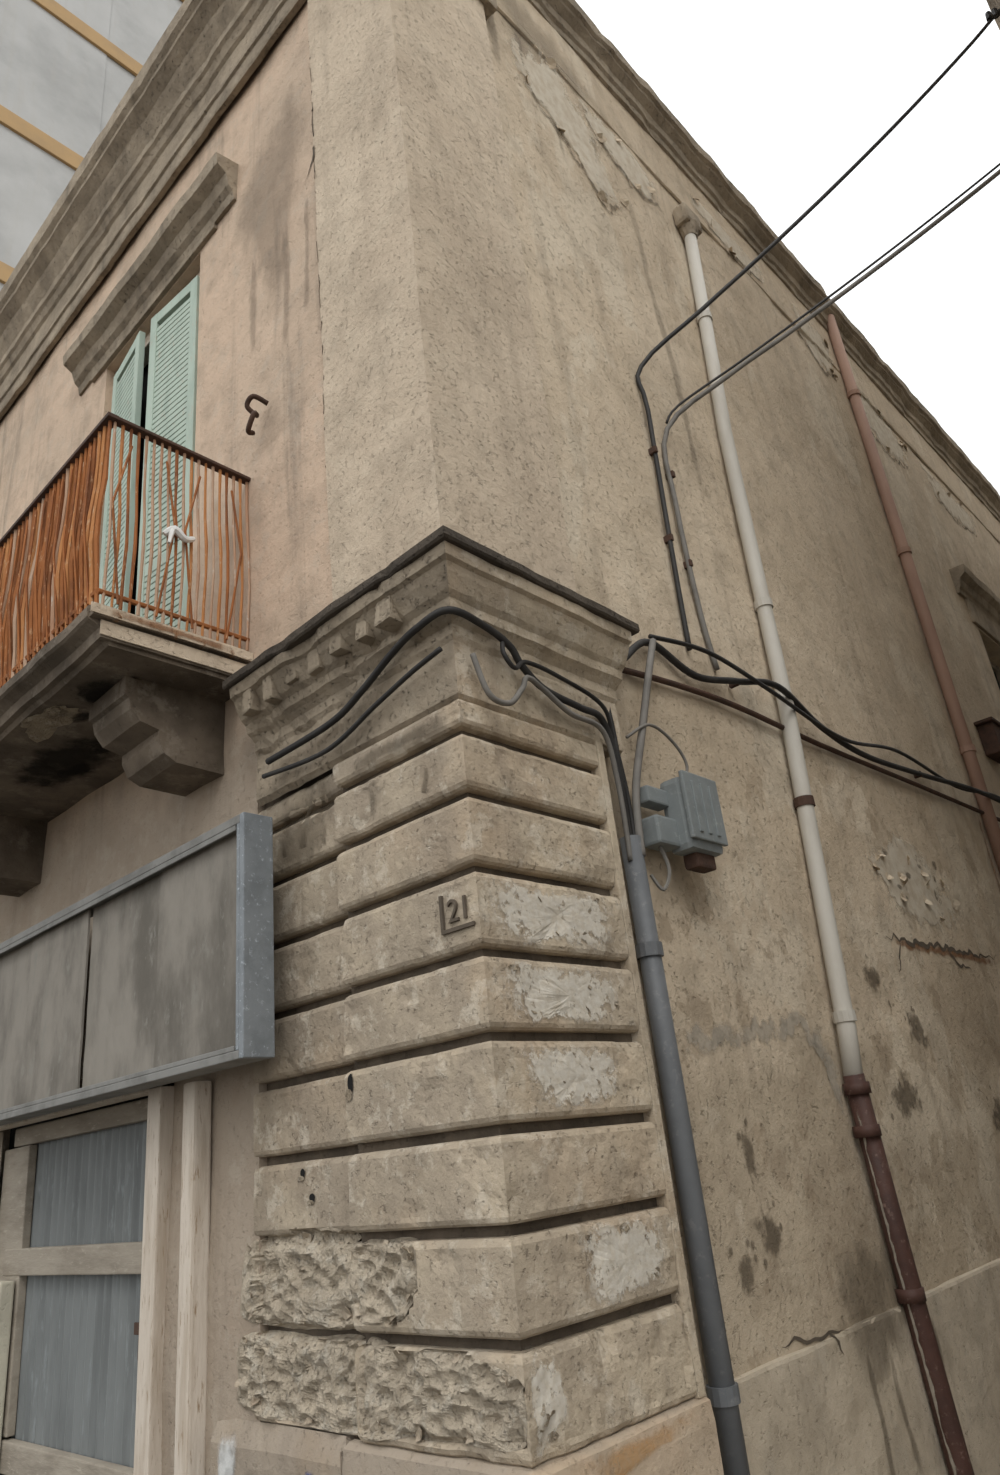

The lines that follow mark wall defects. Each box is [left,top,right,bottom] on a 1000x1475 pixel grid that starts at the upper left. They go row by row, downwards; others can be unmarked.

water stain [73,681,114,722]
water stain [19,739,108,786]
crack [886,933,995,972]
water stain [737,1119,754,1170]
spalling [298,1169,315,1205]
water stain [730,1201,782,1293]
spalling [235,1227,566,1453]
crack [782,1330,844,1354]